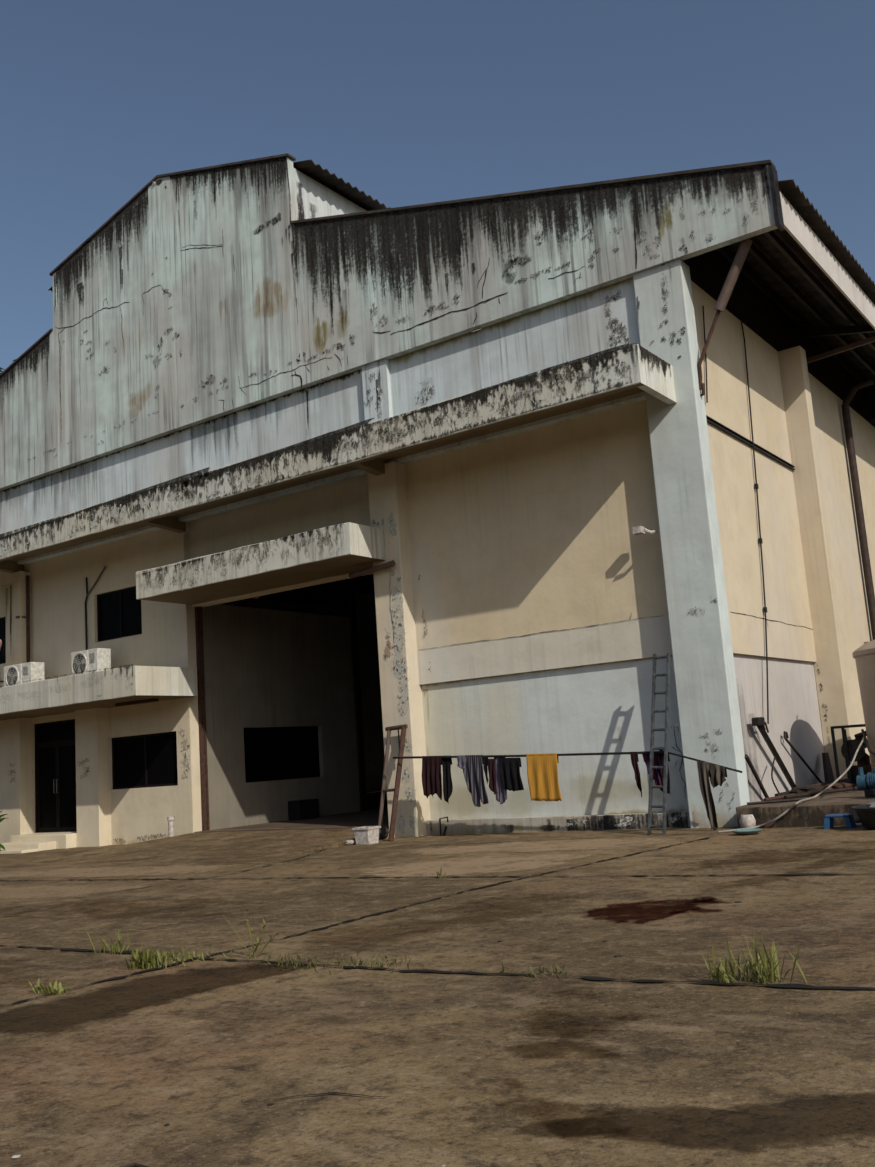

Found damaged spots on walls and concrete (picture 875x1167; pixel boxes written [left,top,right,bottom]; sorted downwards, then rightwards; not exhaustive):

damp [0,335,50,388]
damp [54,188,148,310]
crack [374,263,508,335]
damp [169,157,773,321]
damp [0,343,671,550]
peeling [384,570,409,715]